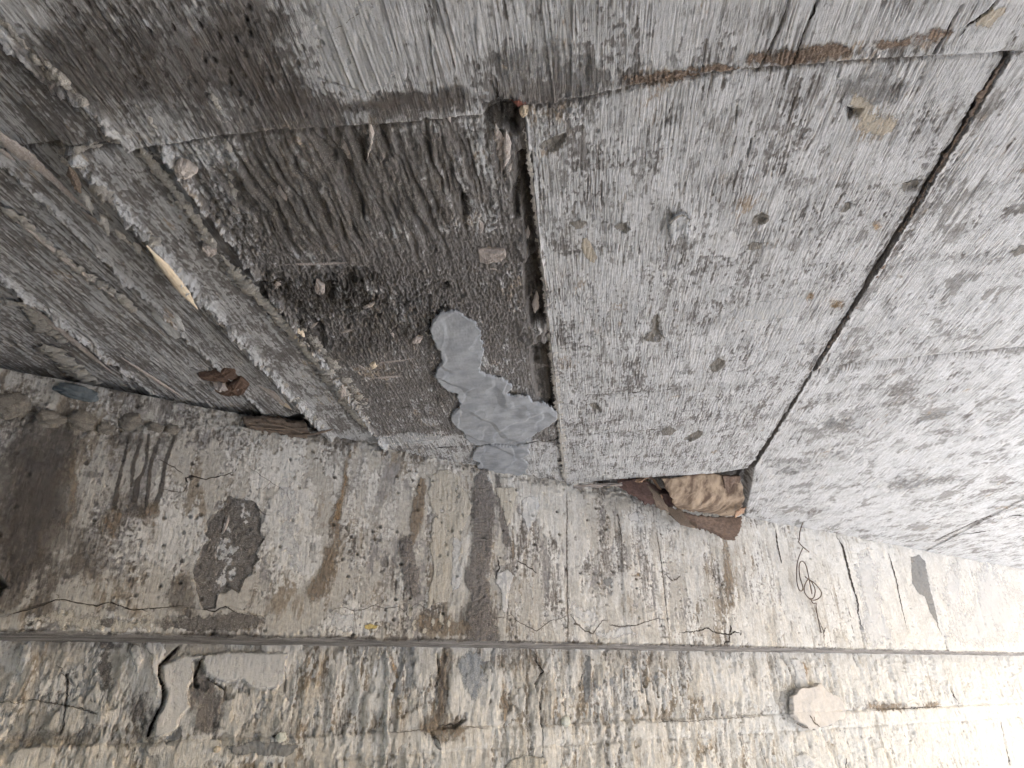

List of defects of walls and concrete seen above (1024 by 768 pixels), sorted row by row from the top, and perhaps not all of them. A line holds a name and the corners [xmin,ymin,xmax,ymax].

corrosion [622,43,852,86]
corrosion [873,27,955,50]
damp [112,433,176,515]
crack [7,594,175,617]
spalling [156,496,265,633]
damp [400,468,539,700]
peeling [130,650,287,742]